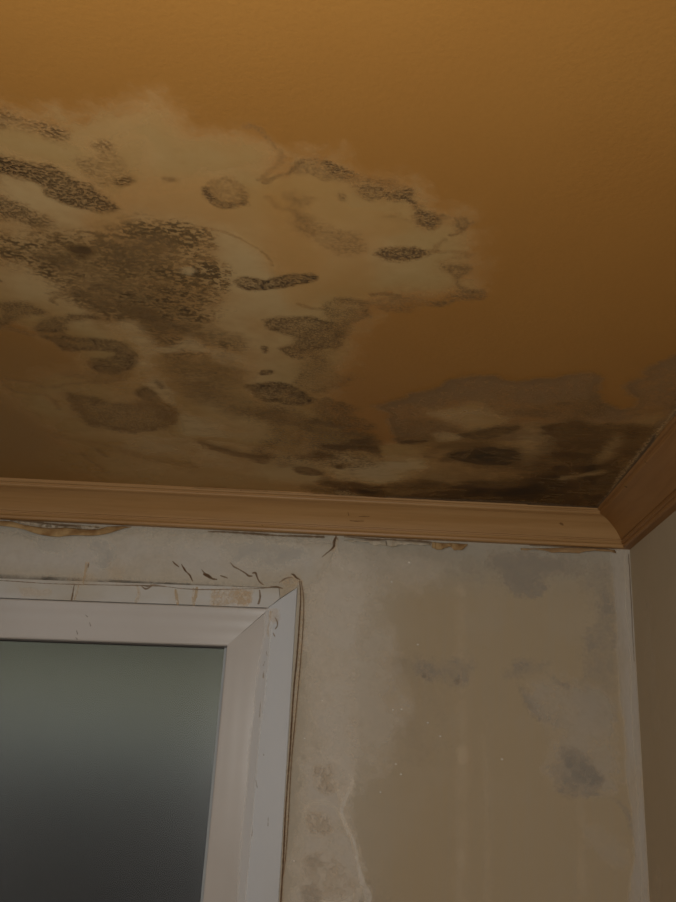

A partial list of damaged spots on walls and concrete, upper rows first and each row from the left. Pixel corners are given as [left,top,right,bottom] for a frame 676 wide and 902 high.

water stain [0,111,676,507]
crack [172,561,304,902]